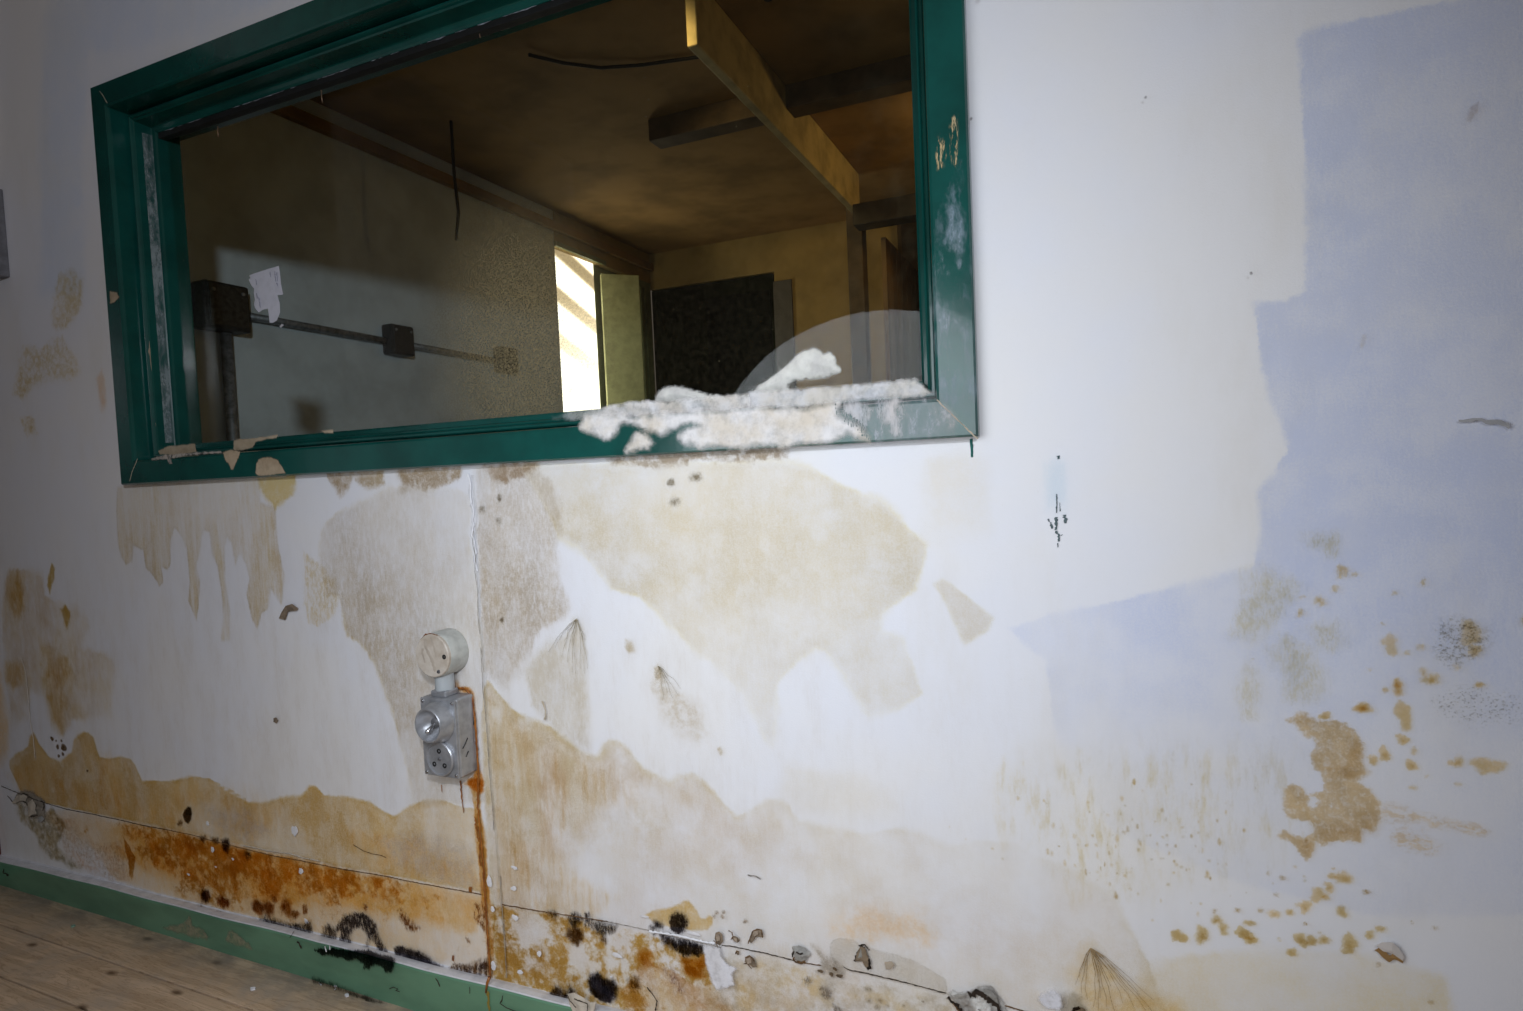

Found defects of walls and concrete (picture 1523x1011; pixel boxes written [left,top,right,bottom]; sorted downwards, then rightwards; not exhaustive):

peeling [579,401,868,452]
peeling [152,435,285,476]
water stain [553,619,588,674]
water stain [177,807,251,858]
rust [441,685,491,1011]
water stain [201,889,229,912]
water stain [252,898,489,977]
water stain [548,913,616,946]
water stain [650,912,704,978]
water stain [550,972,639,1003]
water stain [1075,948,1152,1011]